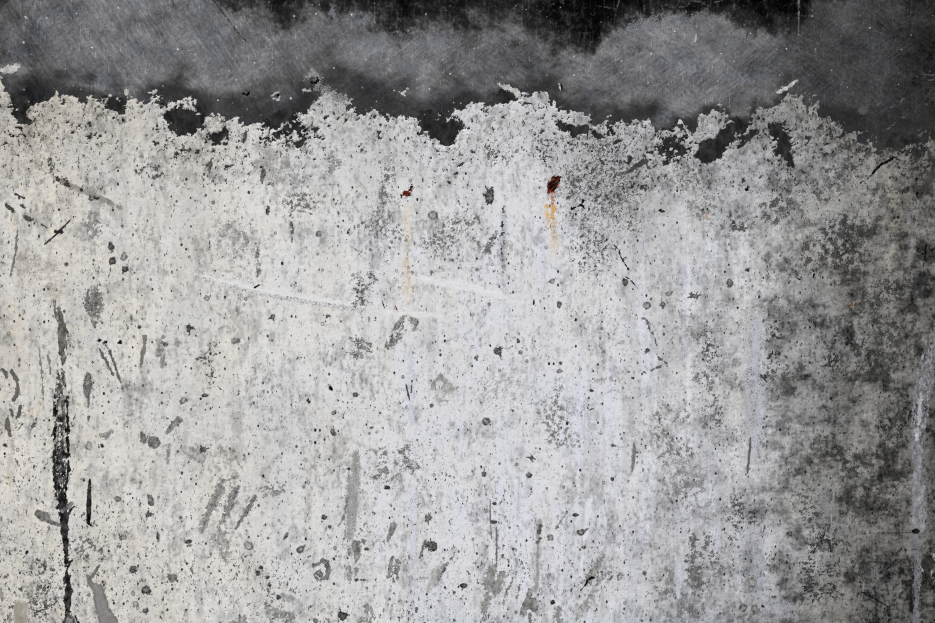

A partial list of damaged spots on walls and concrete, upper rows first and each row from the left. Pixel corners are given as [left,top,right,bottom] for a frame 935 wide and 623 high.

peeling [7,94,34,128]
peeling [100,95,126,121]
peeling [160,101,229,152]
peeling [259,91,319,148]
peeling [417,109,469,147]
peeling [496,83,521,104]
peeling [555,117,613,139]
peeling [649,116,796,167]
rust [544,176,563,265]
rust [382,184,416,310]
leakage [529,120,935,623]
leakage [0,250,115,623]